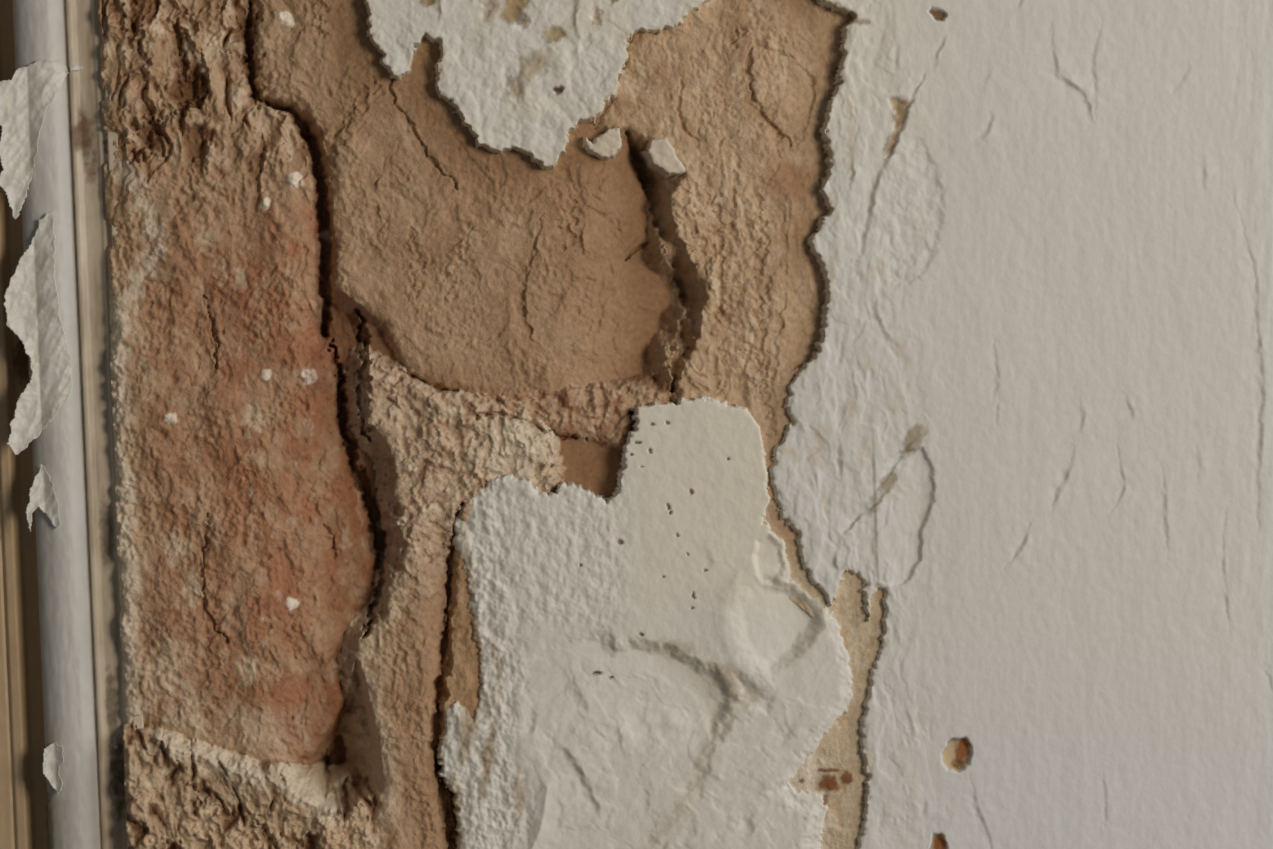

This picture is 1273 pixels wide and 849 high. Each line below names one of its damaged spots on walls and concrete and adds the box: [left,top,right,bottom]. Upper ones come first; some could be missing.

peeling [4,211,73,455]
peeling [0,59,83,219]
peeling [26,464,61,531]
crack [260,95,335,343]
crack [388,79,459,192]
crack [403,372,590,442]
flaking render [98,0,952,849]
crack [518,213,545,320]
crack [620,121,706,398]
peeling [43,742,64,796]
crack [425,502,466,849]
rust [953,740,969,768]